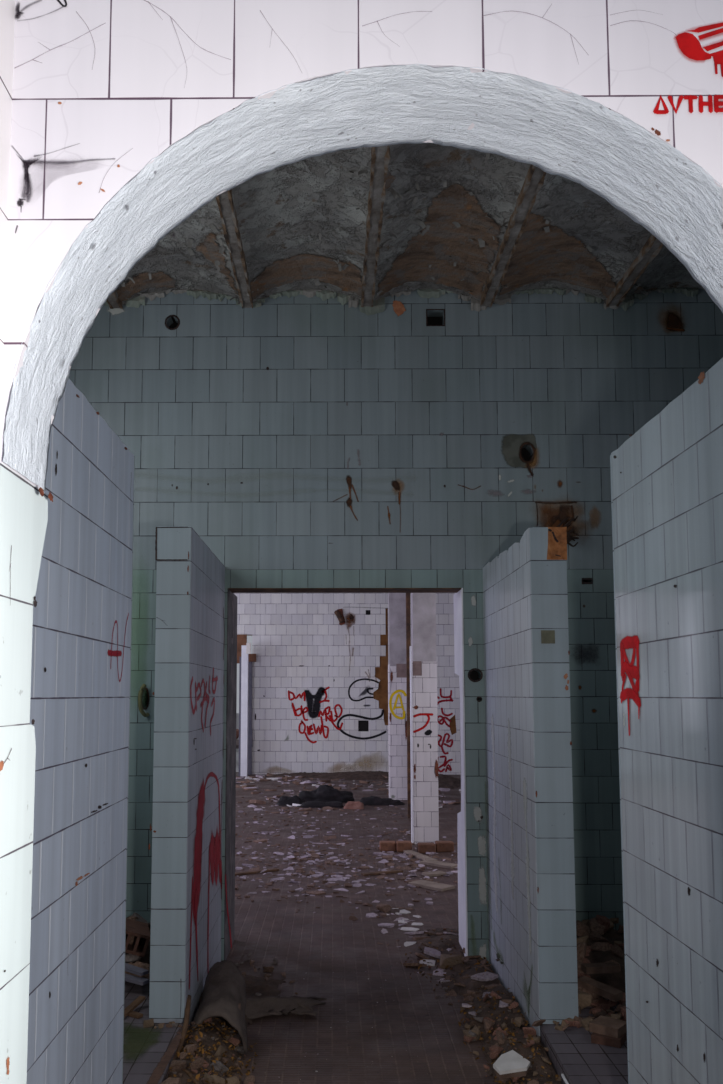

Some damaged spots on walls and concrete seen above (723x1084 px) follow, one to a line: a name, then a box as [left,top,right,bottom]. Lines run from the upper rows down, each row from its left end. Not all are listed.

crack [15,13,105,68]
crack [144,0,231,87]
water stain [12,146,103,211]
peeling [108,247,181,315]
peeling [173,224,362,305]
corrosion [333,451,360,521]
corrosion [387,481,402,524]
corrosion [535,502,598,535]